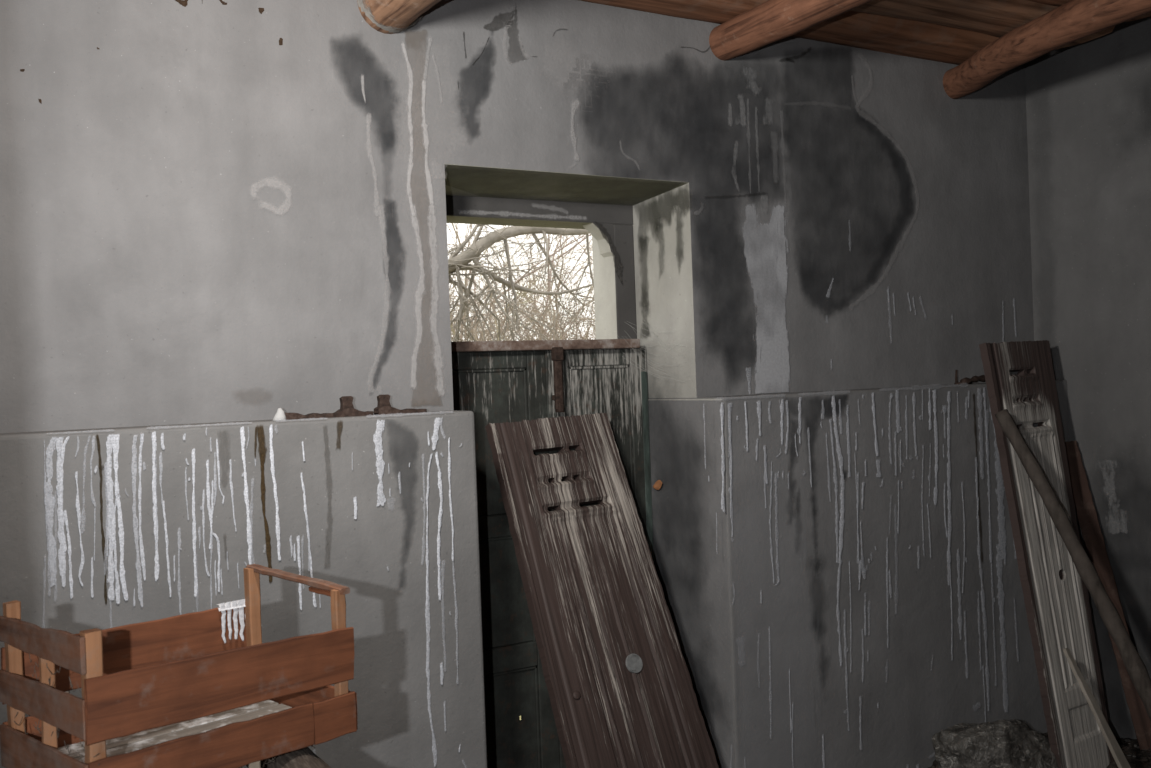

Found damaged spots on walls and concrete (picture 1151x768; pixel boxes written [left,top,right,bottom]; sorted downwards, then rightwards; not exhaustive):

water stain [338,42,394,147]
water stain [460,47,492,135]
water stain [385,203,404,289]
water stain [44,426,256,615]
water stain [269,424,321,610]
water stain [373,420,410,506]
water stain [402,32,454,766]
water stain [571,59,1017,750]